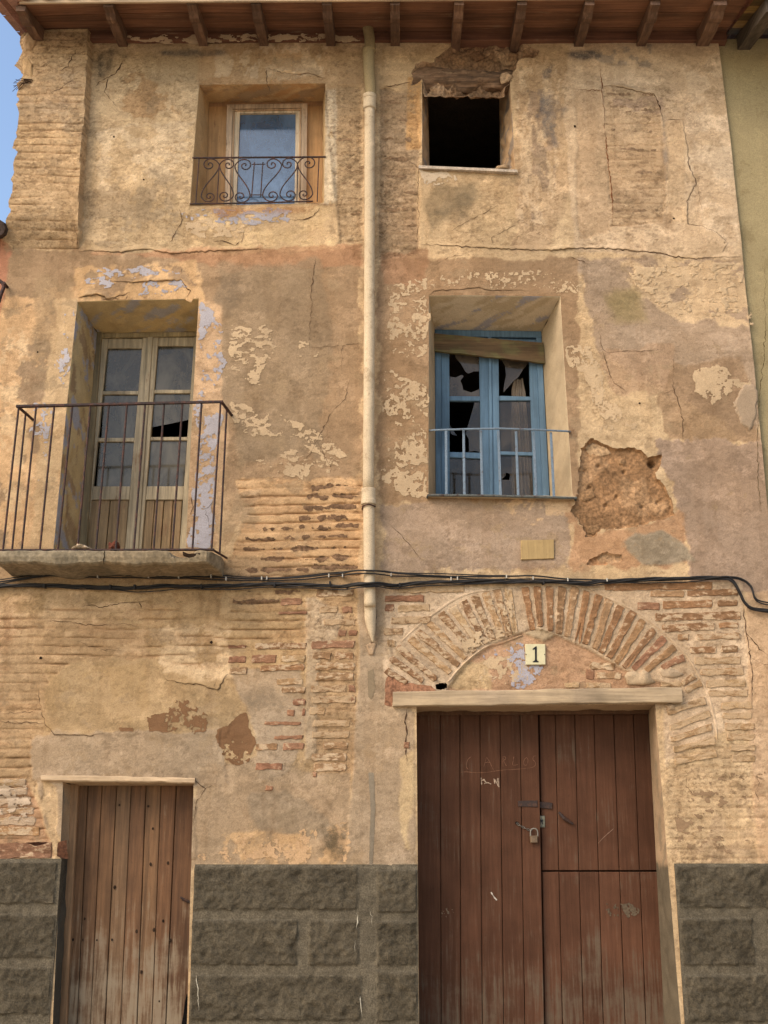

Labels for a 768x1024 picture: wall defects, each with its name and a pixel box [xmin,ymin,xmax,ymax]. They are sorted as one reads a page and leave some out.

flaking render [411,44,539,100]
crack [73,209,264,302]
peeling [386,269,587,359]
crack [412,62,766,509]
peeling [183,302,359,574]
peeling [381,370,429,498]
flaking render [570,438,675,537]
peeling [692,365,758,430]
crack [0,685,104,737]
crack [166,672,228,690]
flaking render [147,589,357,777]
peeling [455,590,543,689]